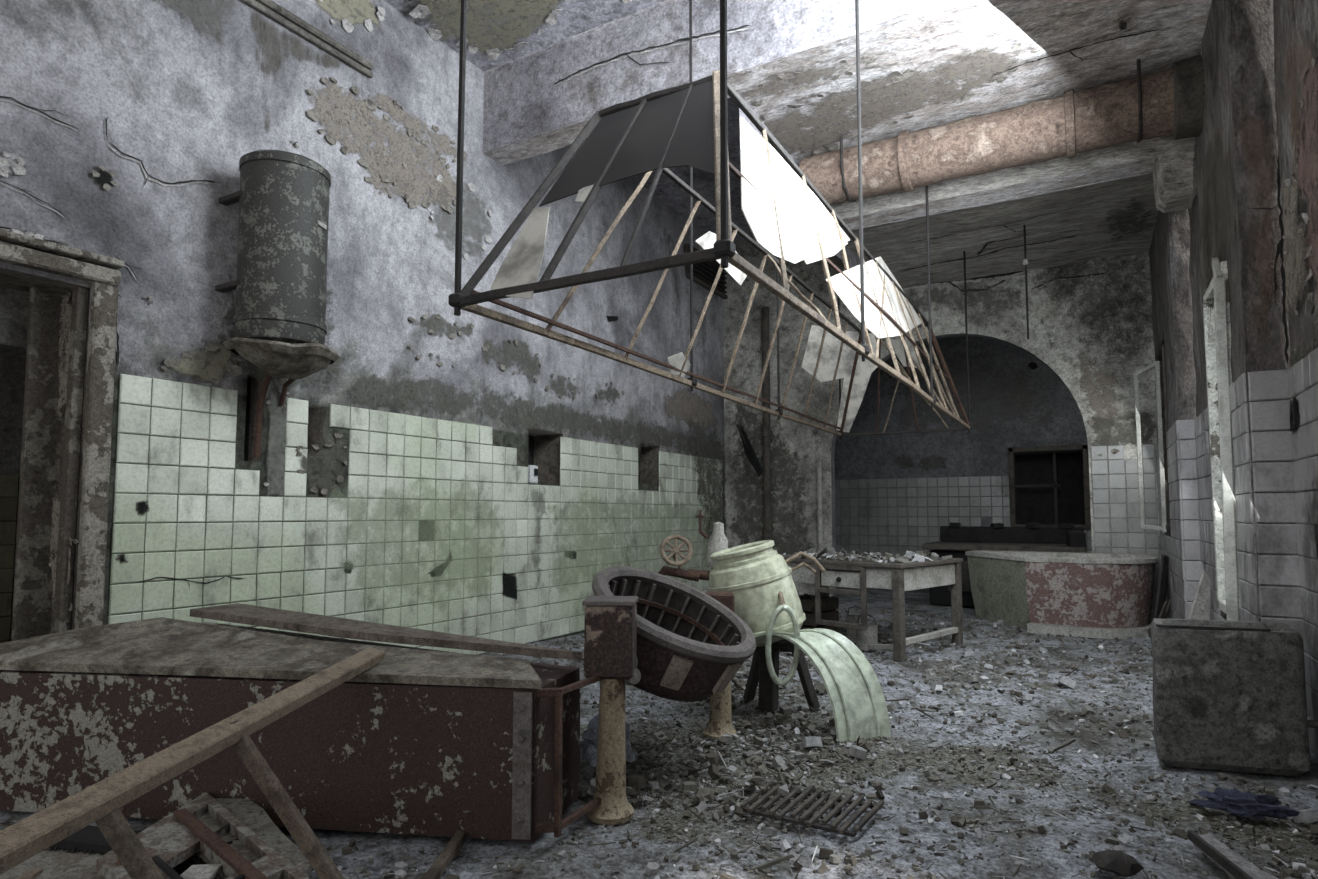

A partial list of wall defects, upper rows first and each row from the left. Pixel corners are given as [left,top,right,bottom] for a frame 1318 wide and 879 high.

flaking render [409,0,567,60]
crack [0,96,218,187]
flaking render [306,77,493,260]
spalling [296,433,348,495]